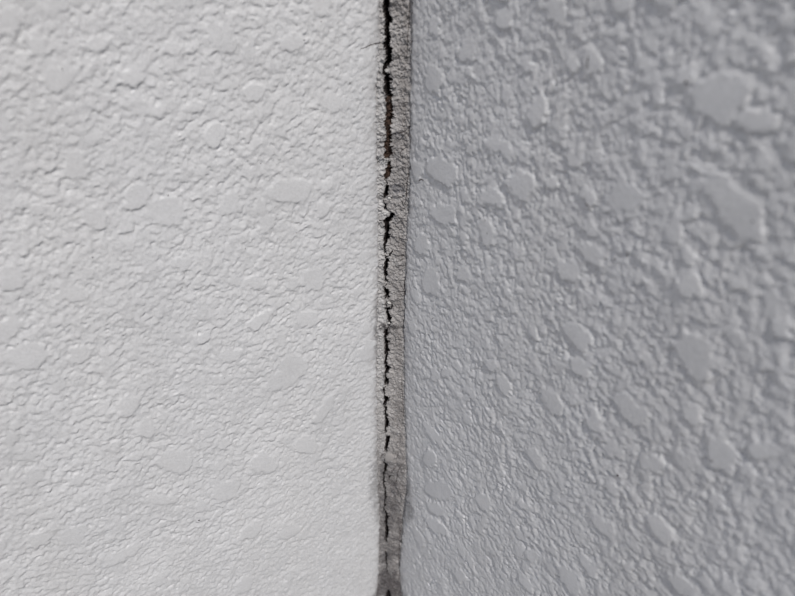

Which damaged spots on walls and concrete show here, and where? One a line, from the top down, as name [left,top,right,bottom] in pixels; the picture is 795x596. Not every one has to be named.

crack [361,0,424,596]